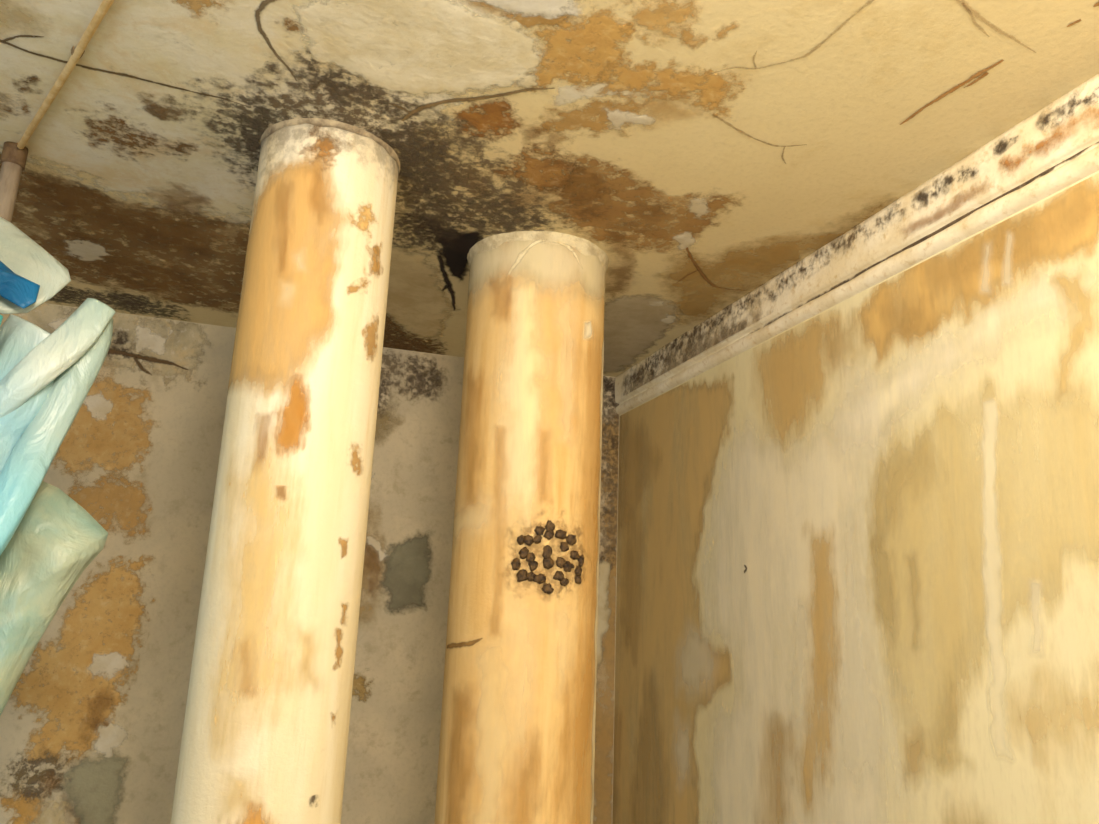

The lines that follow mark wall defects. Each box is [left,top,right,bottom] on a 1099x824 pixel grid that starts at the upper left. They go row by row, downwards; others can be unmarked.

crack [0,35,250,108]
crack [255,0,297,81]
peeling [0,0,744,224]
crack [900,59,1004,125]
damp [996,136,1018,154]
damp [1038,94,1096,126]
damp [11,52,734,390]
peeling [673,232,696,250]
crack [438,256,456,310]
damp [500,283,584,595]
damp [591,141,1099,824]
peeling [352,674,371,702]